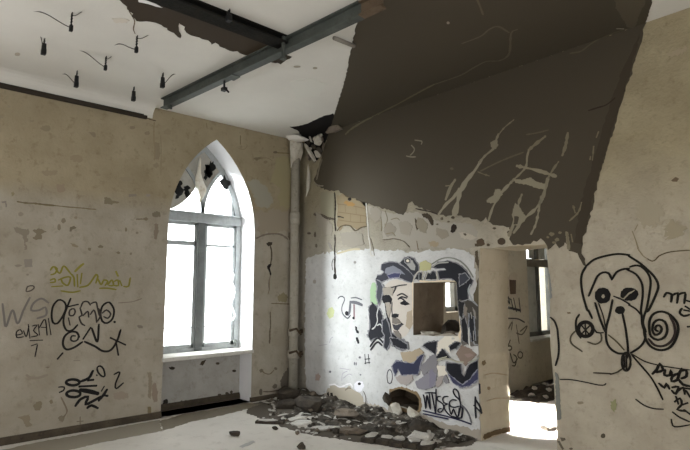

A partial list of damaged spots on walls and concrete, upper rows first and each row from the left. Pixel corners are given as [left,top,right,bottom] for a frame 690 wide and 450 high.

spalling [286,113,342,196]
spalling [307,191,513,305]